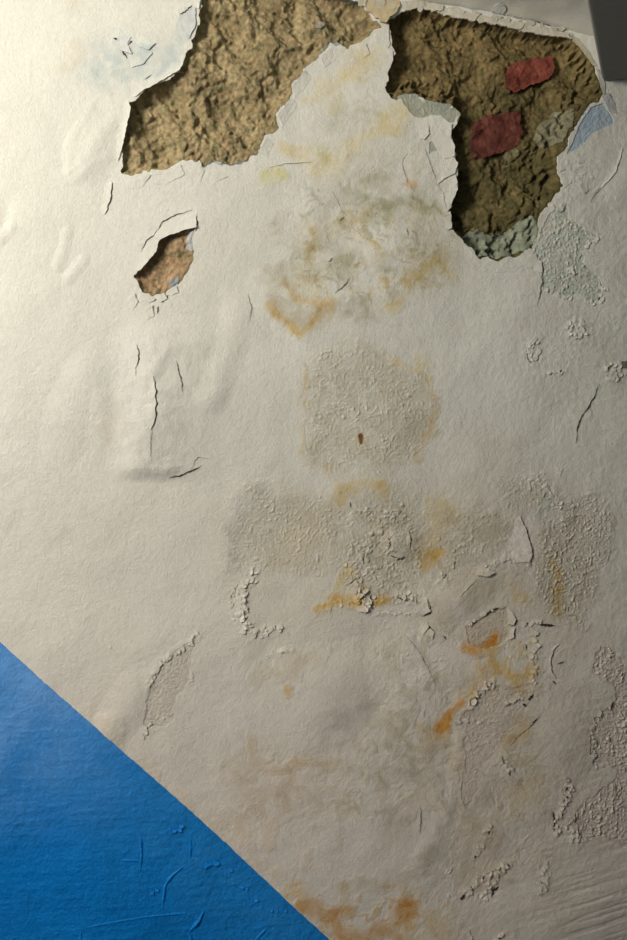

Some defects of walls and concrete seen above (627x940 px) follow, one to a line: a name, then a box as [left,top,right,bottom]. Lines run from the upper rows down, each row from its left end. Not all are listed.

flaking render [112,0,617,320]
leakage [263,34,471,310]
crack [135,346,158,456]
crack [576,384,600,441]
peeling [143,629,198,727]
peeling [228,567,283,638]
leakage [79,285,617,940]
corrosion [456,626,552,697]
peeling [551,646,627,847]
corrosion [286,870,468,940]